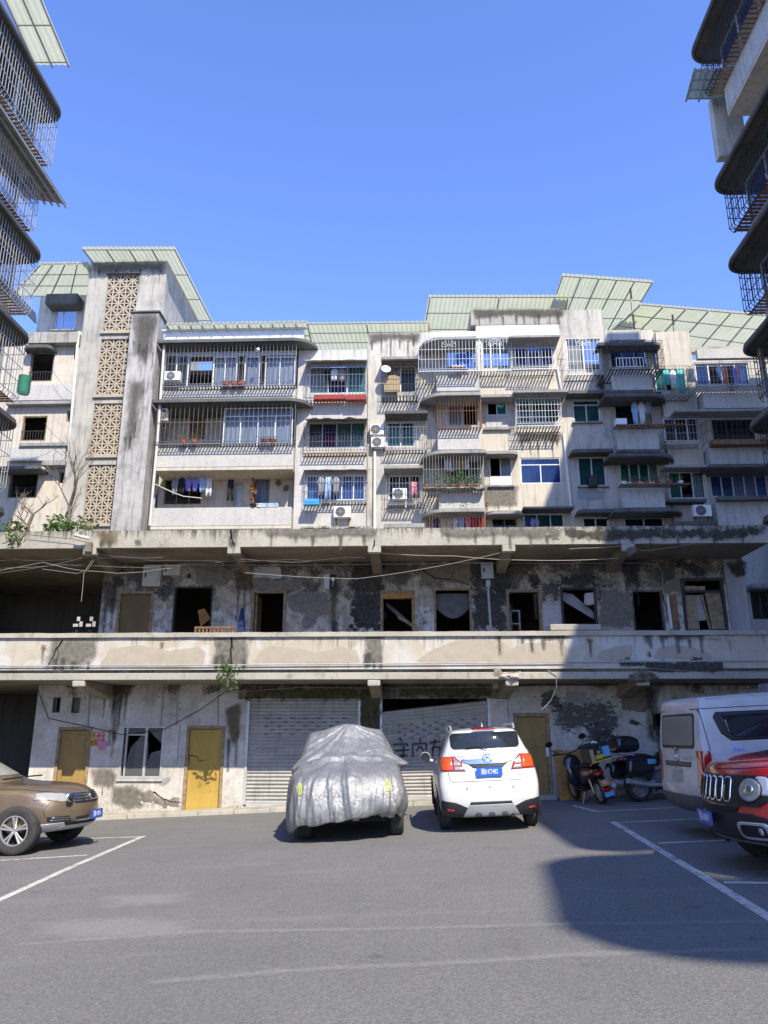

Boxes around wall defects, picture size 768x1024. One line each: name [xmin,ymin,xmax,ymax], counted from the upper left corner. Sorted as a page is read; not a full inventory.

water stain [133,315,156,362]
water stain [125,383,142,446]
water stain [521,636,565,651]
water stain [619,635,723,674]
water stain [110,685,131,739]
water stain [226,705,240,771]
water stain [92,769,144,809]